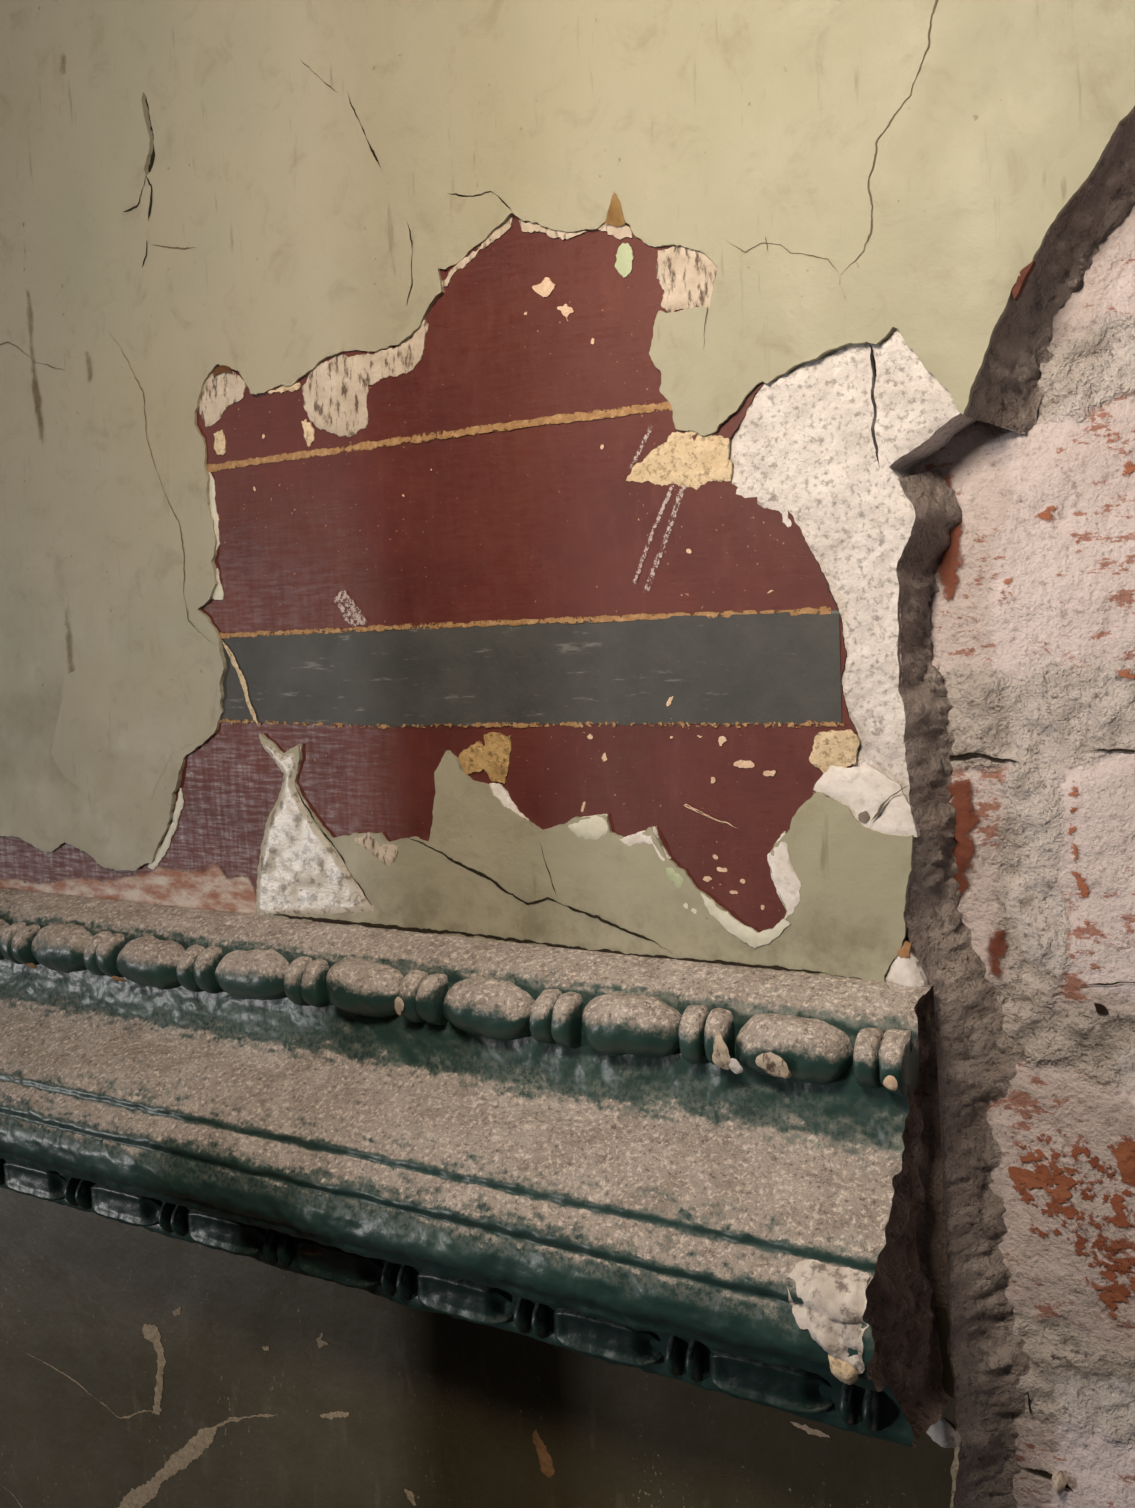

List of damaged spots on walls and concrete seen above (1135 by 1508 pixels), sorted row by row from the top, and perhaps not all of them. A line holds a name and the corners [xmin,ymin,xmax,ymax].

crack [123,97,196,267]
crack [733,0,938,299]
crack [112,337,259,727]
peeling [0,215,861,948]
crack [949,752,1020,763]
crack [1087,746,1135,754]
flaking render [730,110,1135,1508]
spalling [395,997,404,1015]
spalling [712,1032,792,1079]
spalling [24,1324,167,1419]
spalling [118,1414,278,1508]
spalling [532,1430,555,1478]